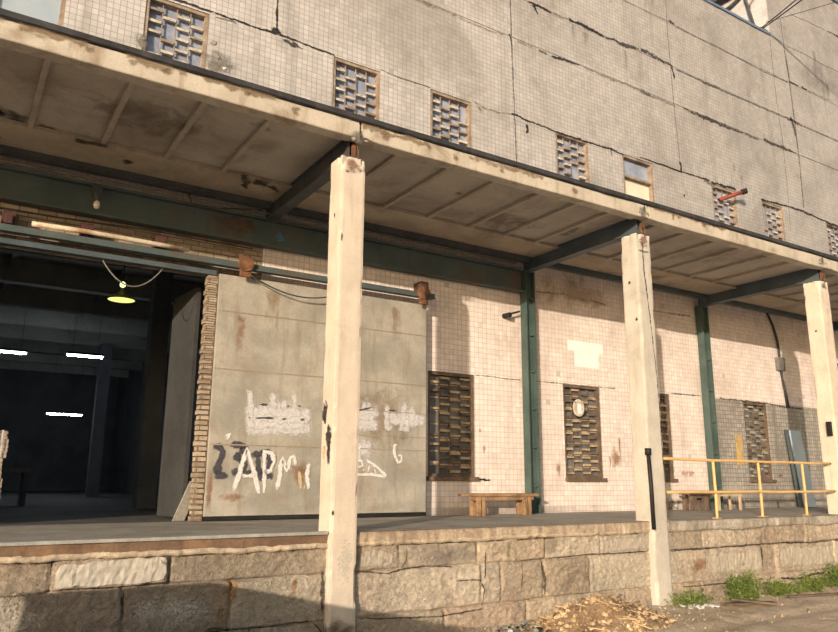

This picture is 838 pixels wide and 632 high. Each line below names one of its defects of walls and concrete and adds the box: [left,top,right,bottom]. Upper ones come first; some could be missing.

crack [175,0,335,56]
crack [418,0,803,154]
leakage [241,175,279,192]
crack [475,102,736,191]
crack [360,533,647,620]